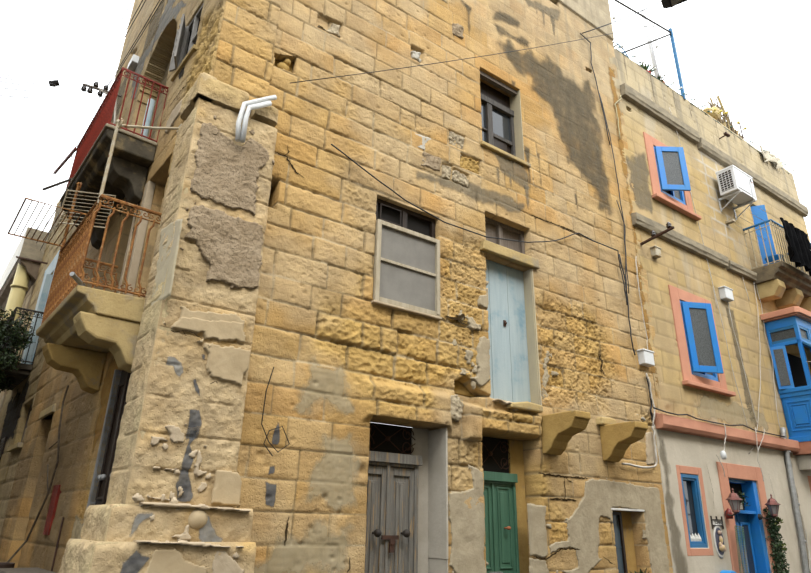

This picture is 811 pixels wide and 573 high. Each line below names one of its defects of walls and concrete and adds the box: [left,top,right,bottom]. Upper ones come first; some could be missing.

peeling [150,424,187,451]
peeling [189,445,212,492]
peeling [132,486,184,522]